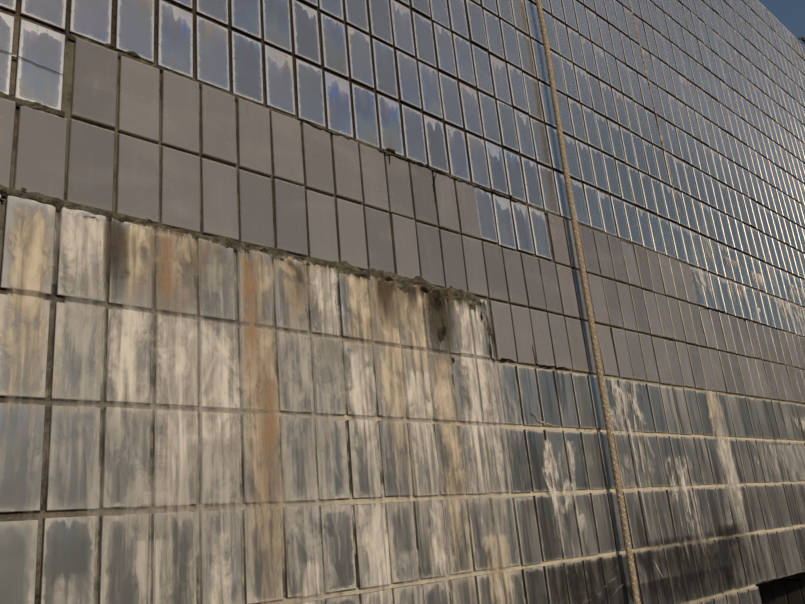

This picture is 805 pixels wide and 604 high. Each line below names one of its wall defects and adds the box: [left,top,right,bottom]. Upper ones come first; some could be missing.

corrosion [159,233,189,291]
corrosion [242,255,282,543]
leakage [543,441,576,512]
leakage [610,380,652,503]
leakage [666,457,700,529]
leakage [707,391,742,512]